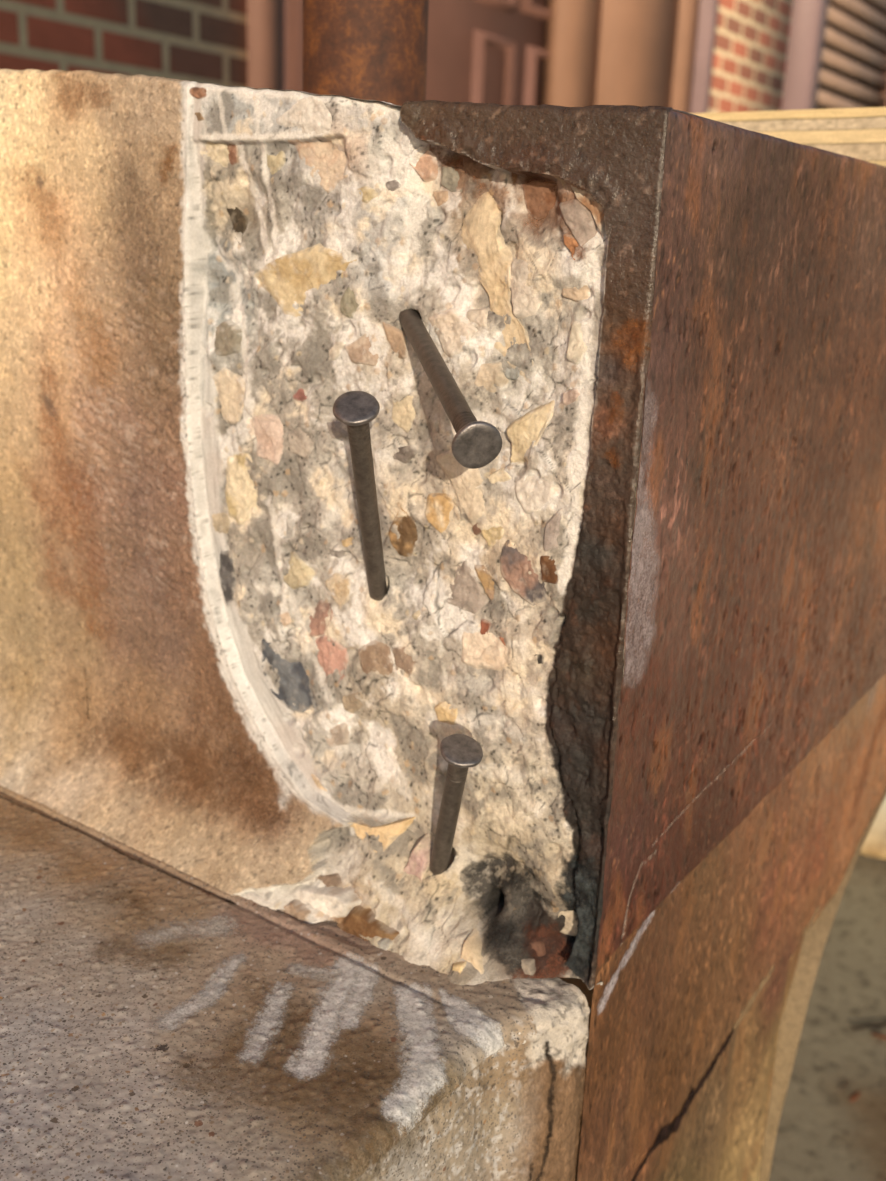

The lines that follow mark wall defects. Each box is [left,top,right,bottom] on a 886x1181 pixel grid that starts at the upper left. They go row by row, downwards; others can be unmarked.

corrosion [429,145,462,166]
spalling [189,83,608,1073]
corrosion [495,305,646,987]
leakage [462,853,597,978]
crack [529,1042,556,1181]
crack [632,1030,734,1181]